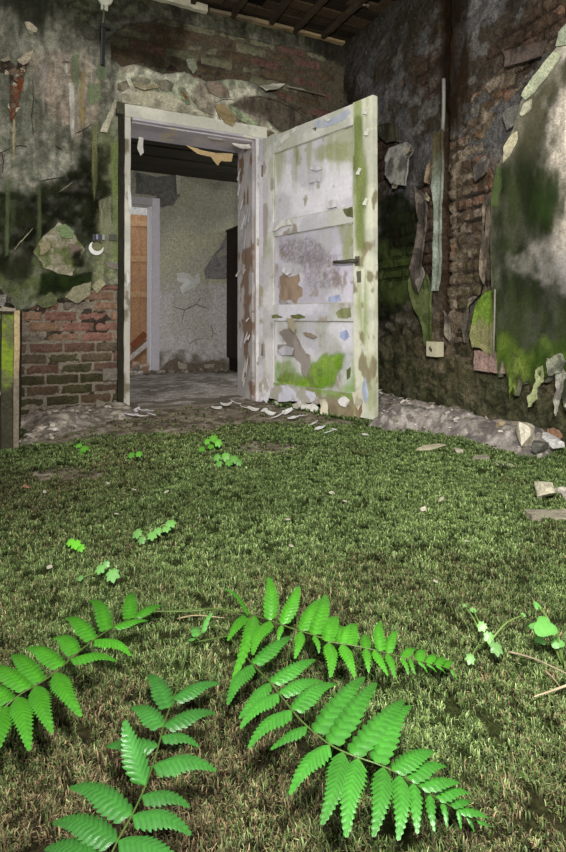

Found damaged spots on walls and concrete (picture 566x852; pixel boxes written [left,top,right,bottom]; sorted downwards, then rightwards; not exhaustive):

crack [0,78,38,173]
peeling [186,137,251,165]
flaking render [100,20,351,146]
leakage [0,142,118,281]
flaking render [33,222,85,276]
leakage [39,250,91,296]
flaking render [21,262,130,415]
peeling [278,264,303,305]
peeling [261,314,368,419]
peeling [328,295,351,319]
peeling [327,198,368,218]
flaking render [364,24,566,416]